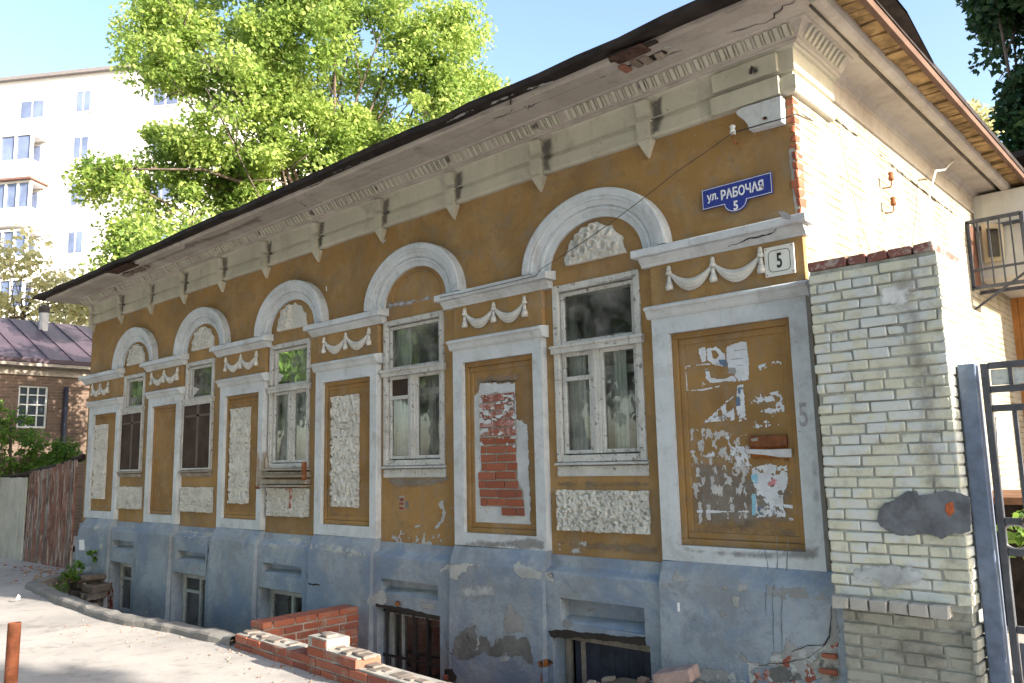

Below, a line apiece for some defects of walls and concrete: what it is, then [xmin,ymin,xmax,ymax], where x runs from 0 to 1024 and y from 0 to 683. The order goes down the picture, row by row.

crack [727,1,796,34]
spalling [608,39,669,73]
leakage [652,98,662,133]
leakage [542,140,552,170]
leakage [455,173,463,199]
crack [728,228,777,247]
spalling [474,382,531,524]
spalling [692,584,840,683]
peeling [443,624,533,683]